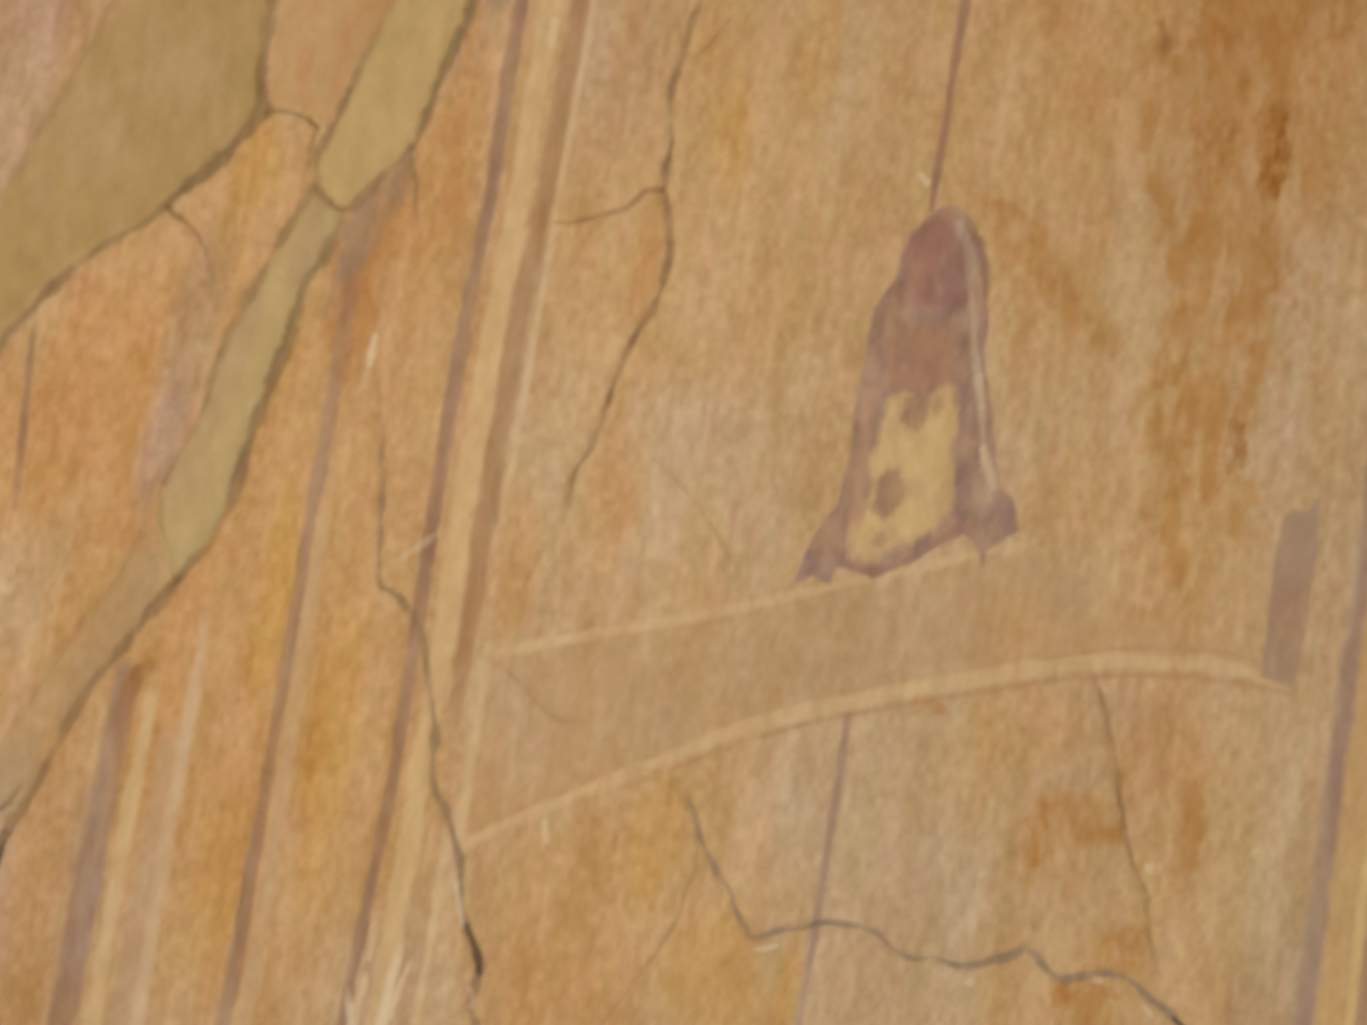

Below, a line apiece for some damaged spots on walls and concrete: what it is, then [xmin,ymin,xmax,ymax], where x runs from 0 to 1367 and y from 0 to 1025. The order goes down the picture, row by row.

crack [0,0,480,872]
crack [371,392,489,1025]
crack [531,0,739,559]
crack [594,673,1185,1025]